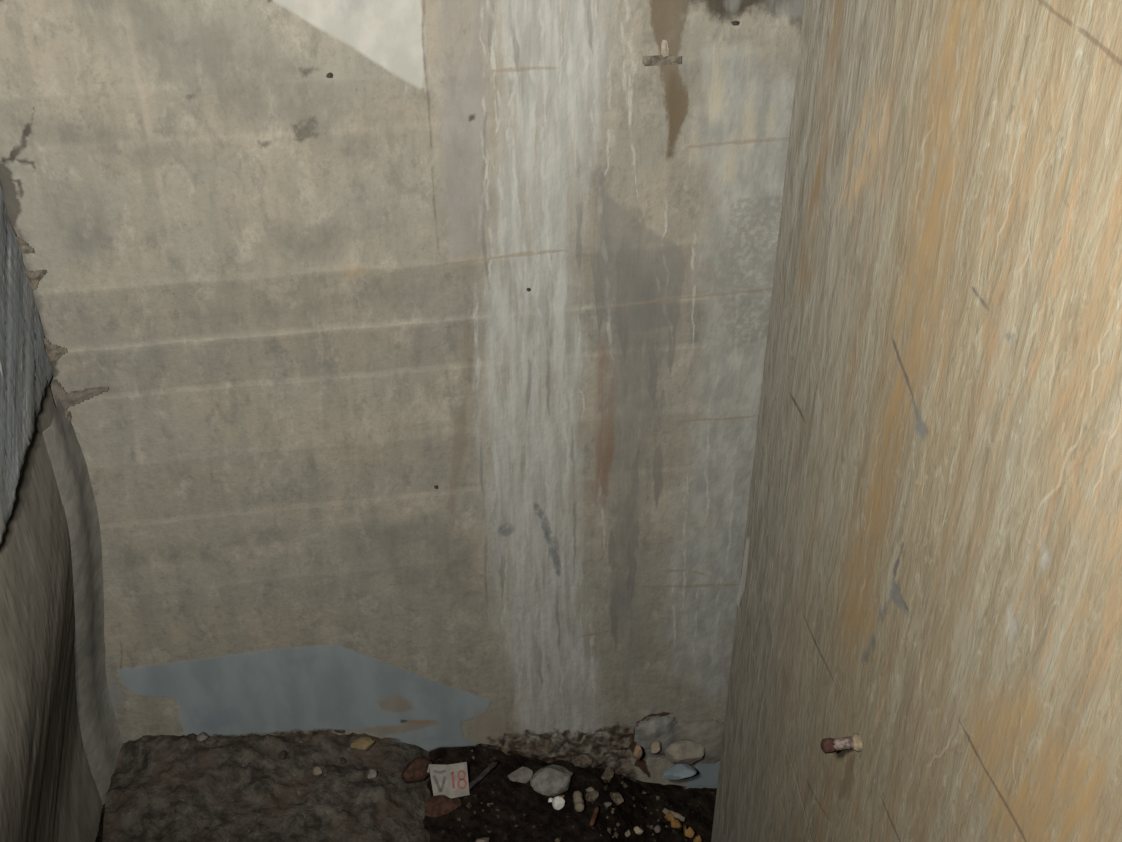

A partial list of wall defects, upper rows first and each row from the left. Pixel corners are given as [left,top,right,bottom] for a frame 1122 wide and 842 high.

spalling [642,40,682,66]
spalling [25,269,47,289]
spalling [44,338,67,363]
damp [488,0,601,742]
spalling [51,379,109,410]